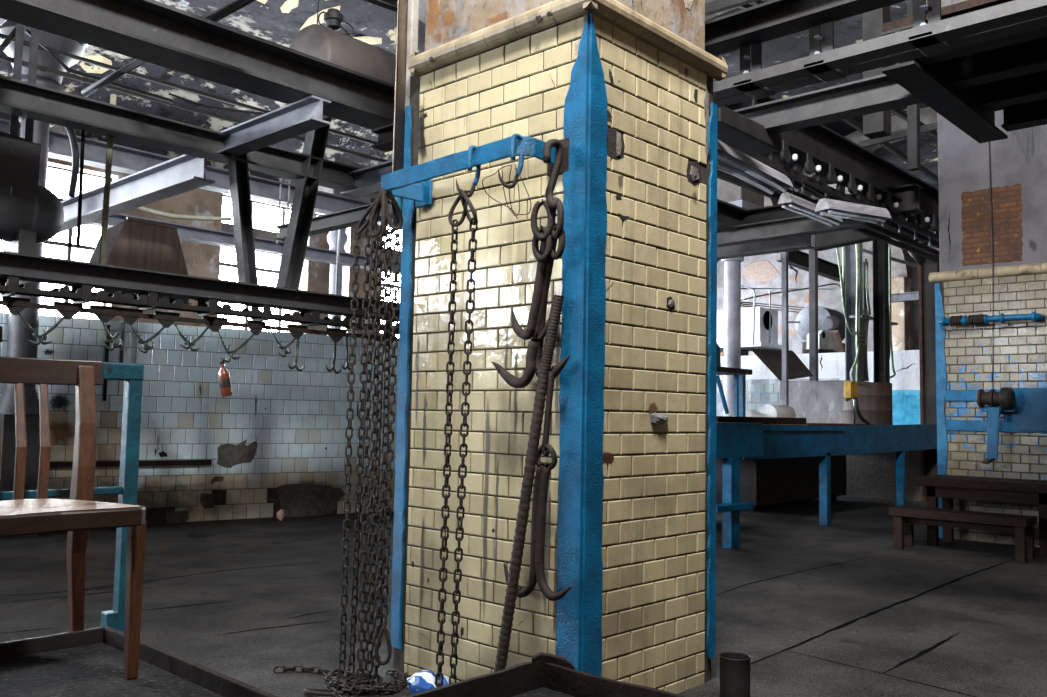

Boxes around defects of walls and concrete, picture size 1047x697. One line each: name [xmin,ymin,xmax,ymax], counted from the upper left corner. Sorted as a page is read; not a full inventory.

peeling [280,0,299,13]
peeling [300,6,340,30]
peeling [80,56,112,74]
flaking render [961,184,1023,266]
damp [416,341,427,458]
spalling [200,440,258,508]
damp [483,411,499,601]
damp [543,478,558,635]